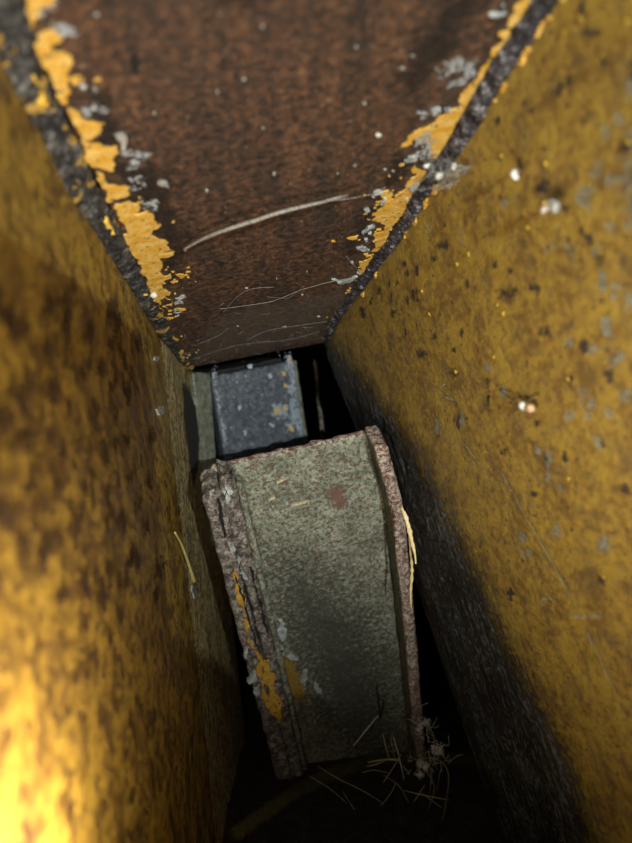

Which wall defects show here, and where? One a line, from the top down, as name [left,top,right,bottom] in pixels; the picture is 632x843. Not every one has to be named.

peeling [534,15,552,38]
peeling [25,0,191,321]
peeling [331,0,532,294]
peeling [359,261,419,318]
peeling [229,544,283,723]
peeling [277,618,299,661]
peeling [300,669,322,695]